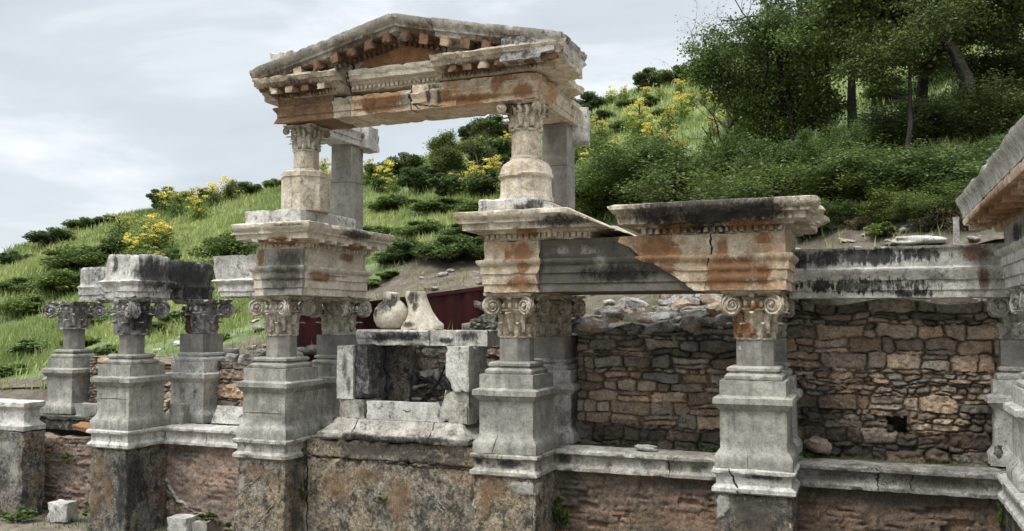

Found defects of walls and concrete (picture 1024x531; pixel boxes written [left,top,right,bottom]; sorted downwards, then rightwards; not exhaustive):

leakage [614,196,794,231]
leakage [135,255,207,296]
leakage [792,247,953,298]
crack [728,457,748,495]